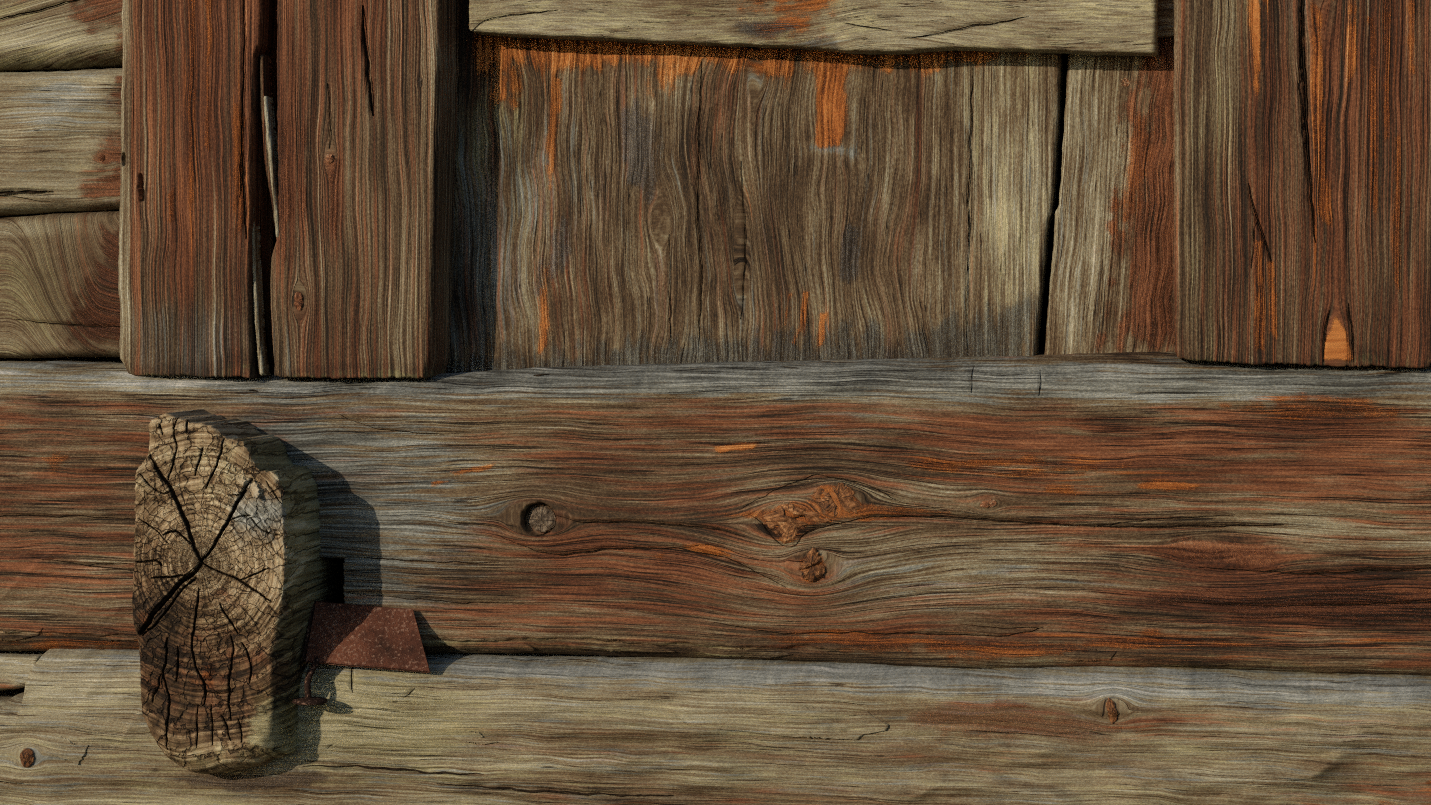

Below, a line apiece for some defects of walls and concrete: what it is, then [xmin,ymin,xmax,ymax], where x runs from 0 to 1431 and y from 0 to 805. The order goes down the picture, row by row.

corrosion [739,0,829,32]
crack [0,418,282,750]